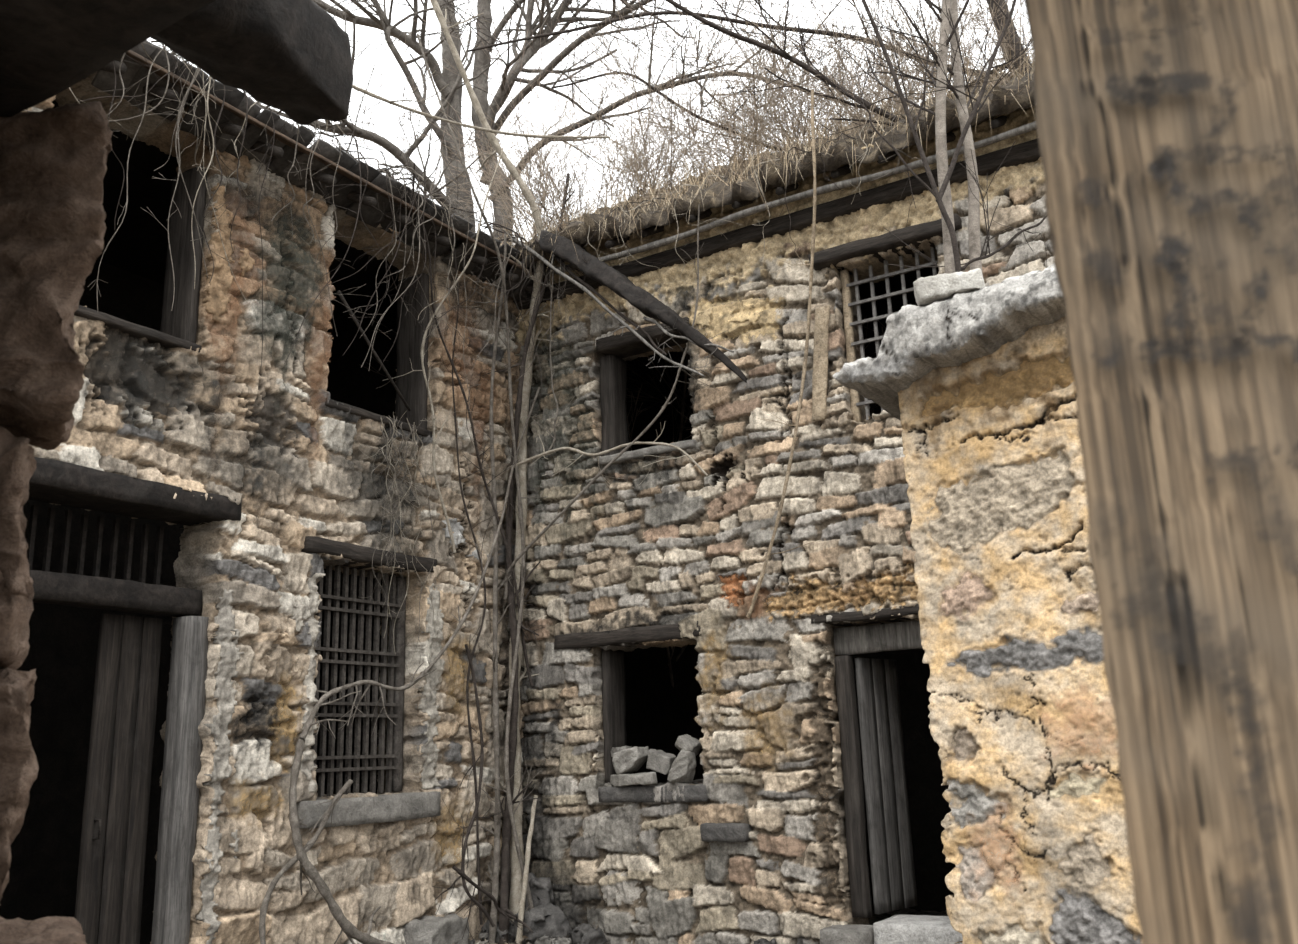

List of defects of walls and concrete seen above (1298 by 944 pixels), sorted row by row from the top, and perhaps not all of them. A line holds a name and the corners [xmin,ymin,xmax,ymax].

crack [1011,526,1092,582]
spalling [947,592,1104,677]
crack [934,674,1120,891]
spalling [979,834,1142,944]